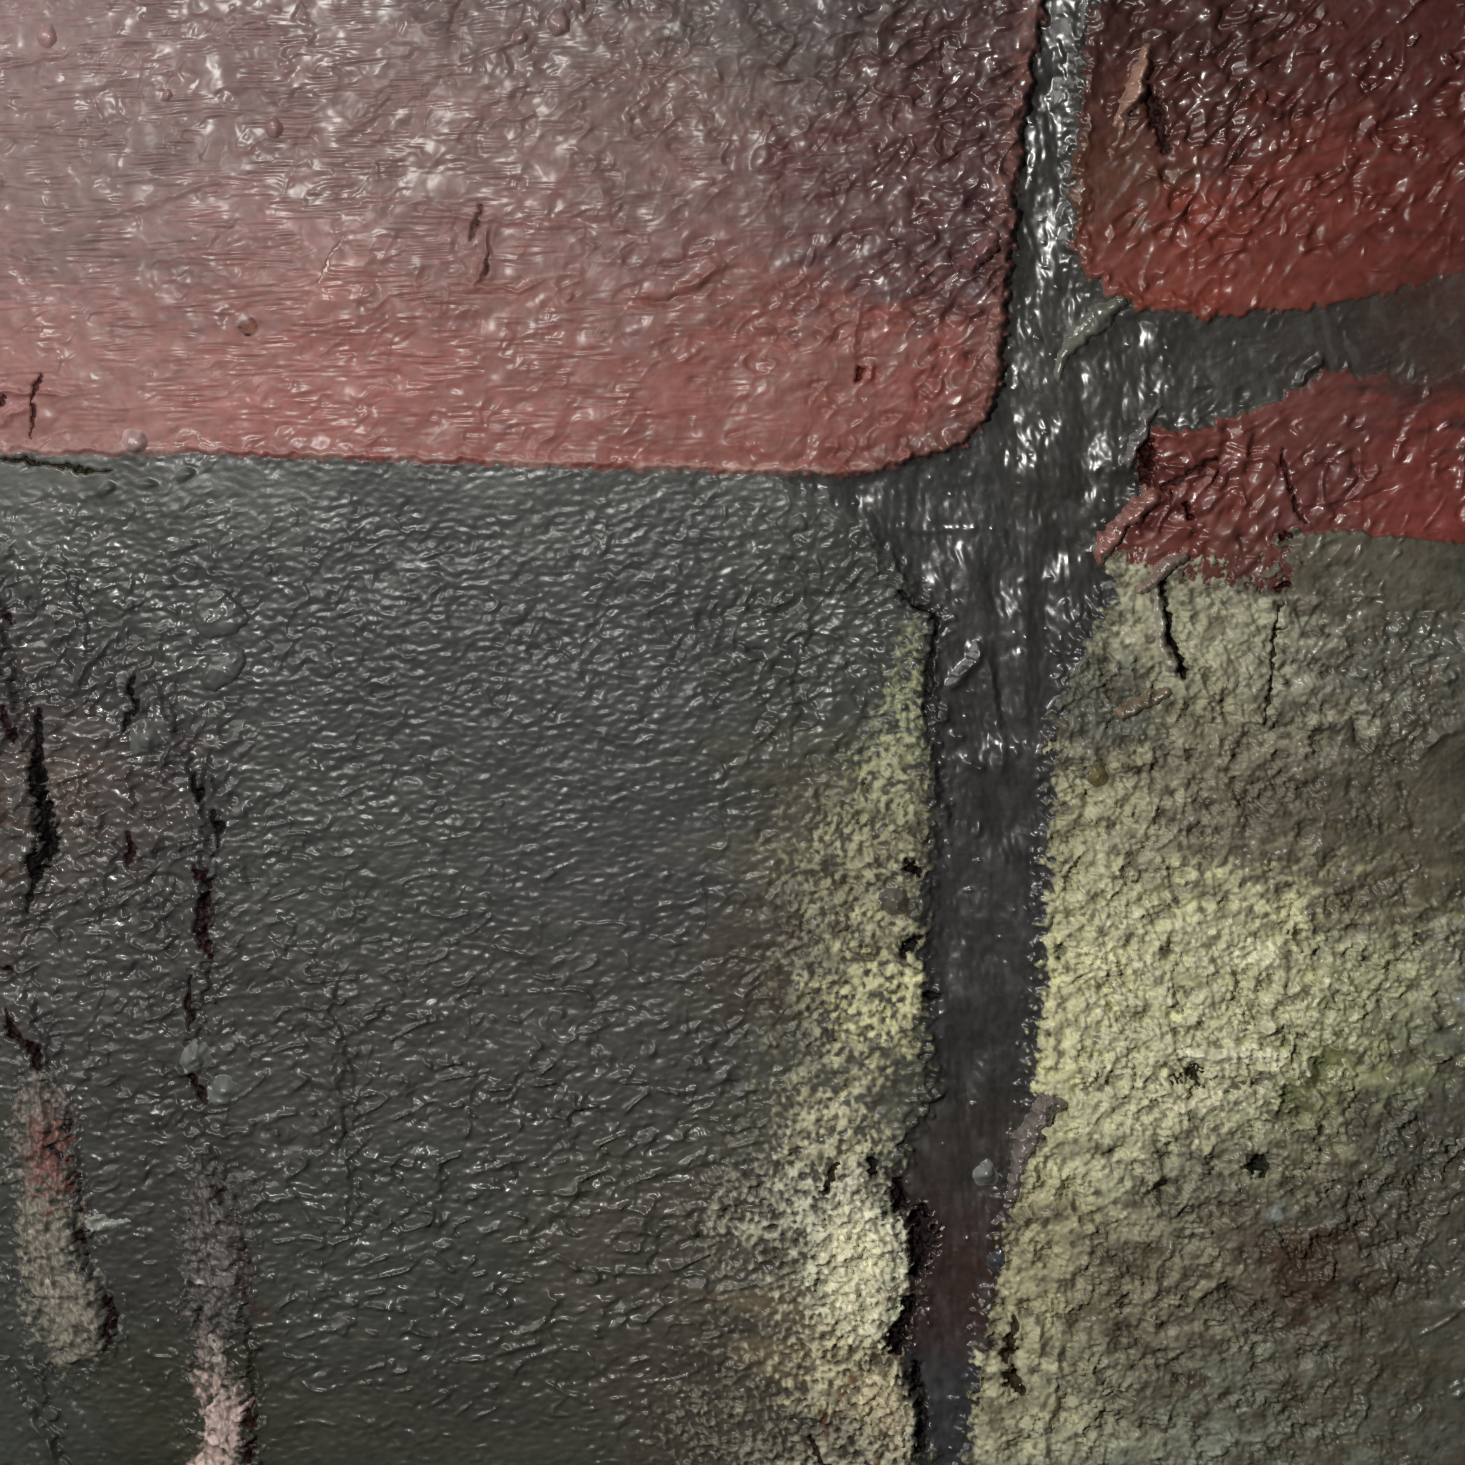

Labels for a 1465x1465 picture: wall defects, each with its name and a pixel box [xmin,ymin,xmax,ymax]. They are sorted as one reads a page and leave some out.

crack [0,373,112,474]
crack [4,613,13,625]
crack [894,590,941,699]
crack [122,675,140,733]
crack [0,669,62,915]
crack [124,831,138,870]
crack [184,772,226,1031]
crack [187,1073,208,1105]